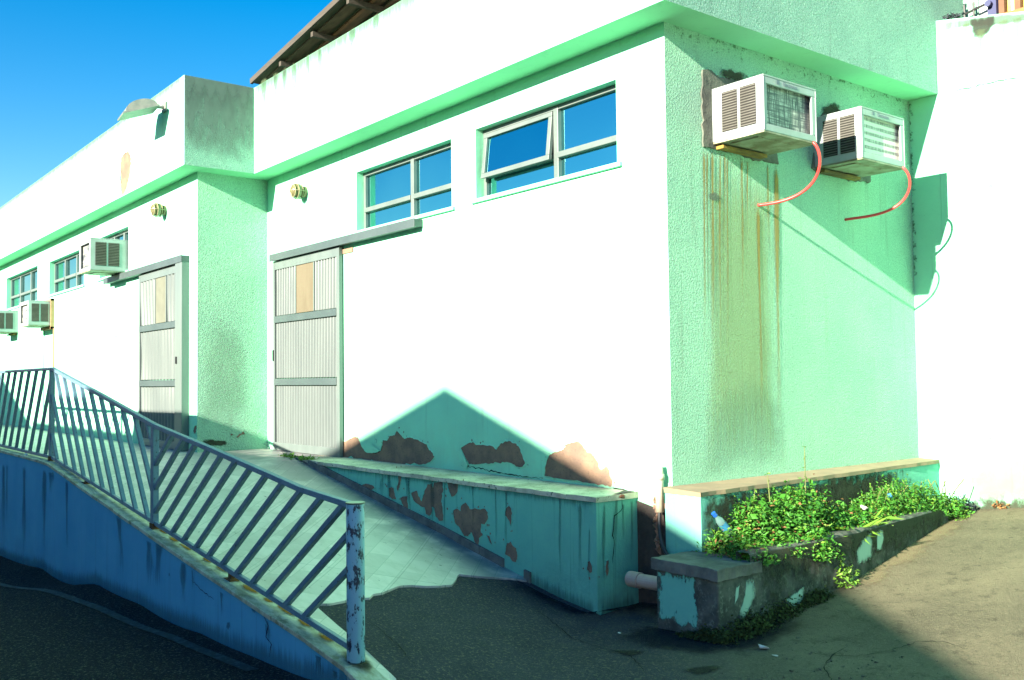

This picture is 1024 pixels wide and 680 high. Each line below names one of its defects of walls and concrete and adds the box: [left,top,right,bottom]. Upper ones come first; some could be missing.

corrosion [703,155,728,280]
corrosion [741,162,779,347]
peeling [343,427,526,563]
peeling [544,435,698,628]
peeling [735,582,754,616]